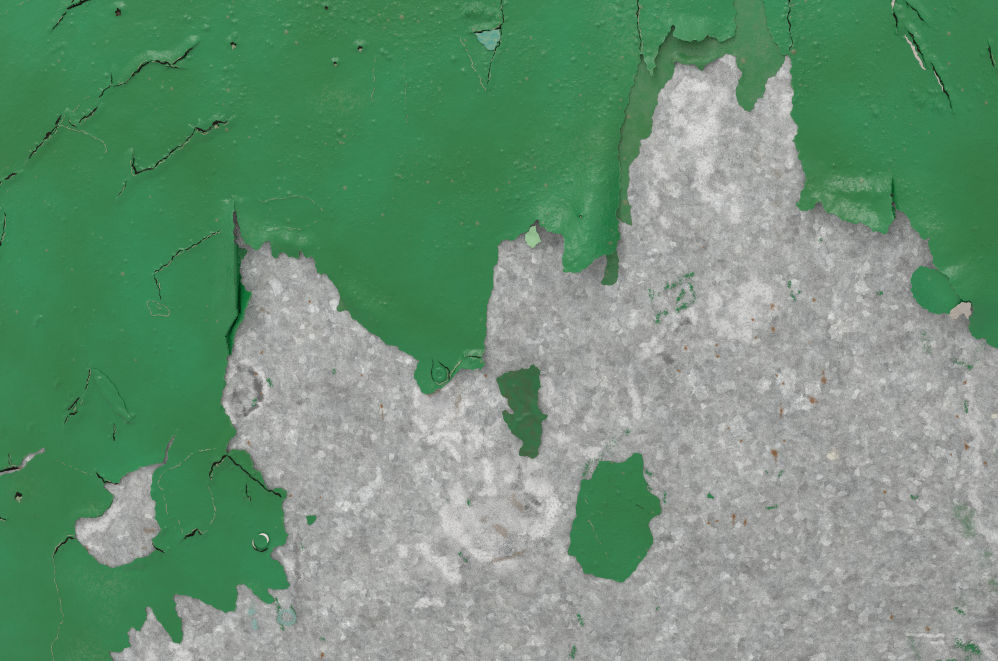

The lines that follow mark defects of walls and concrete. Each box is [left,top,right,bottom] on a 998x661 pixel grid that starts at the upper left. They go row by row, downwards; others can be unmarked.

crack [0,48,193,185]
crack [118,120,228,196]
peeling [562,81,635,273]
peeling [616,0,786,225]
peeling [795,143,896,234]
crack [891,0,952,108]
crack [154,230,220,299]
peeling [893,177,998,339]
crack [0,454,19,472]
peeling [75,436,175,568]
peeling [496,364,548,459]
peeling [567,453,661,582]